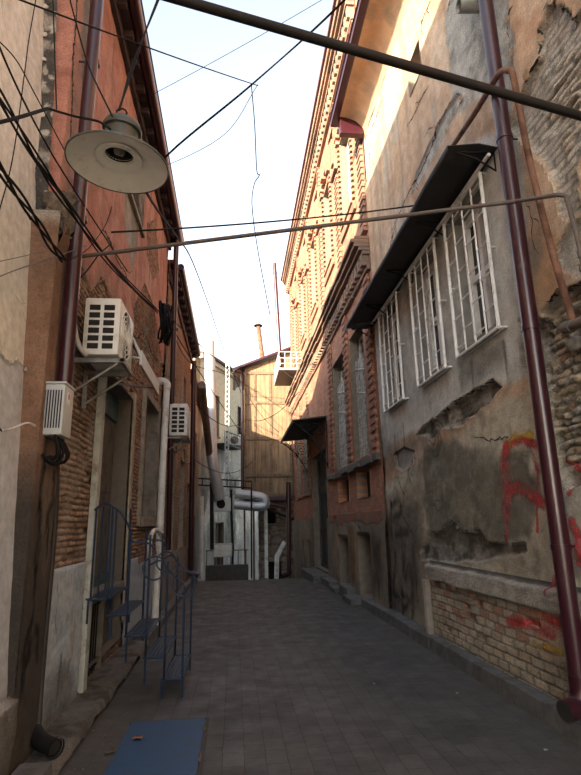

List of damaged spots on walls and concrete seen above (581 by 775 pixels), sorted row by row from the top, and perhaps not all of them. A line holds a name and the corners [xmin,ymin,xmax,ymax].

peeling [444,0,489,84]
spalling [410,84,492,197]
spalling [493,0,581,491]
spalling [415,378,504,441]
spalling [420,520,528,565]